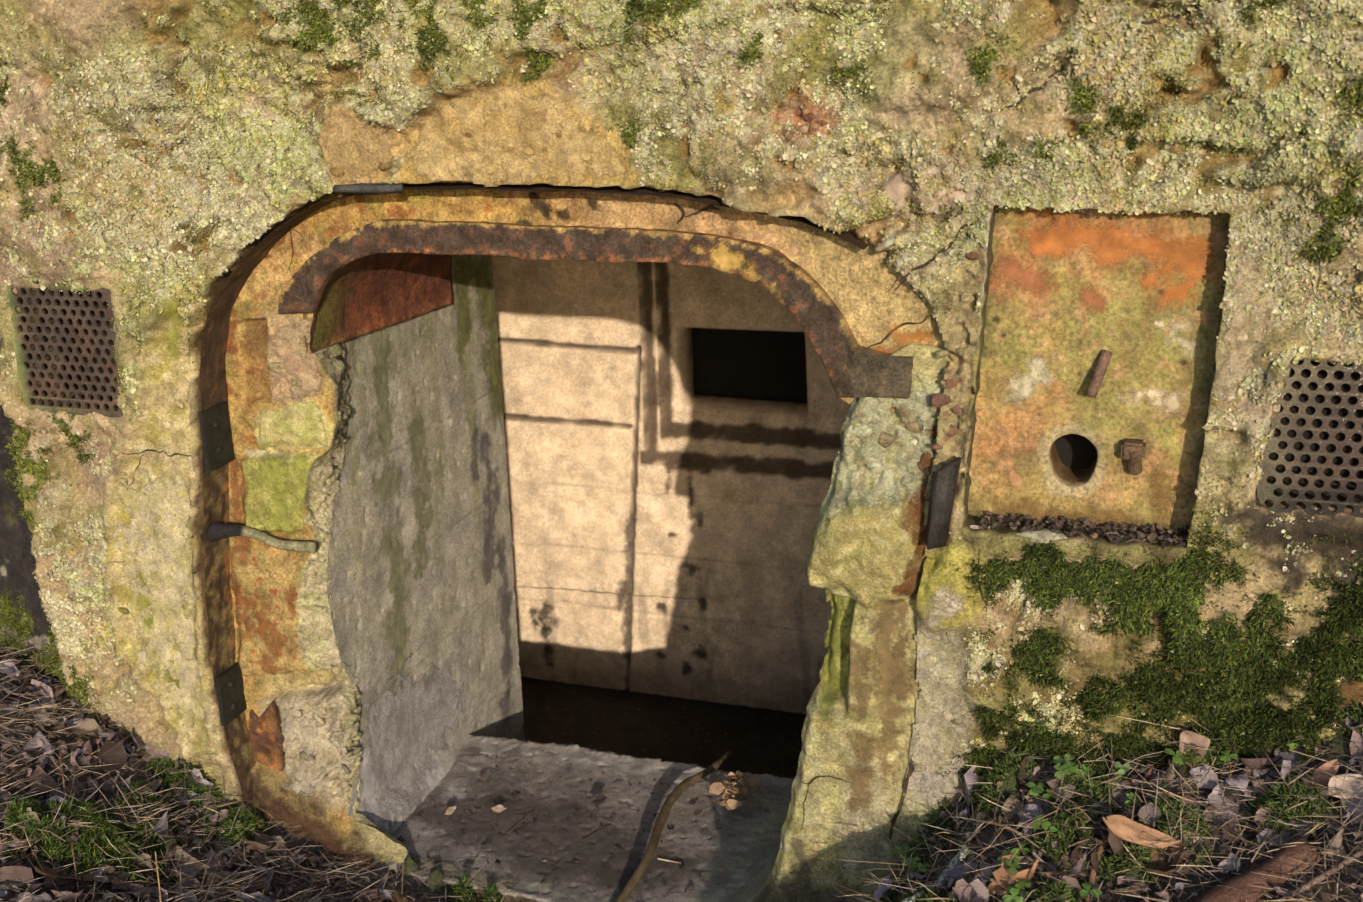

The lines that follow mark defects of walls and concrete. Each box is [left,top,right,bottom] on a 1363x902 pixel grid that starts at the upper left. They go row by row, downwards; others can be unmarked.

corrosion [989,213,1213,307]
corrosion [877,331,932,353]
corrosion [229,444,297,675]
water stain [665,459,710,526]
corrosion [994,496,1138,530]
water stain [360,428,694,901]
water stain [682,647,707,674]
water stain [819,593,843,719]
corrosion [846,426,937,811]
water stain [690,840,852,902]